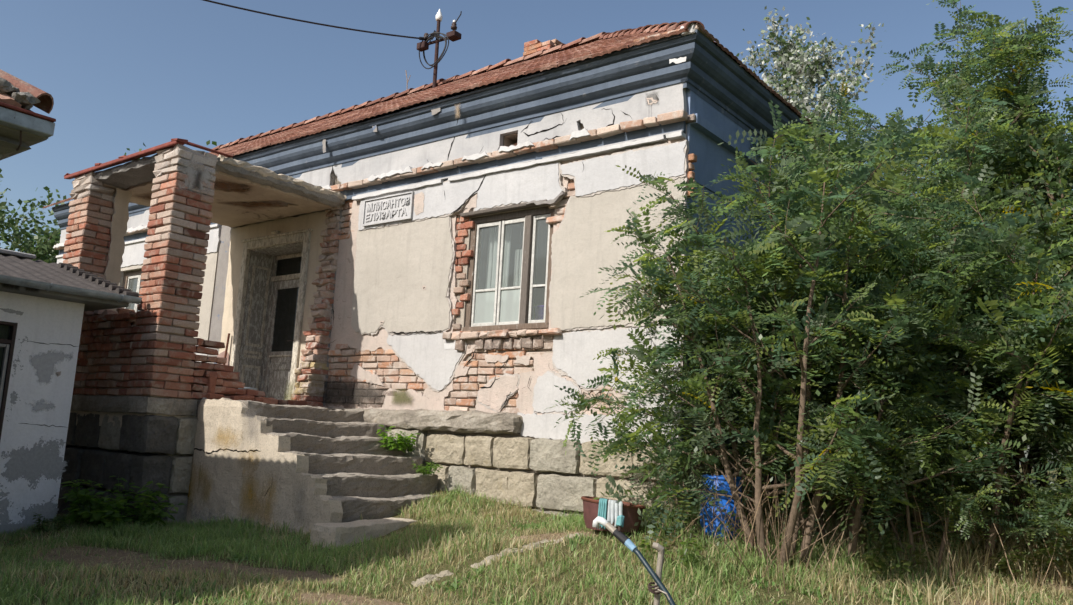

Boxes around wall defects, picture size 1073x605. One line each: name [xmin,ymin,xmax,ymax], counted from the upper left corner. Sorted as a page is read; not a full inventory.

spalling [325,140,697,415]
peeling [12,336,71,383]
crack [463,350,531,410]
peeling [0,438,69,524]
crack [194,447,258,455]